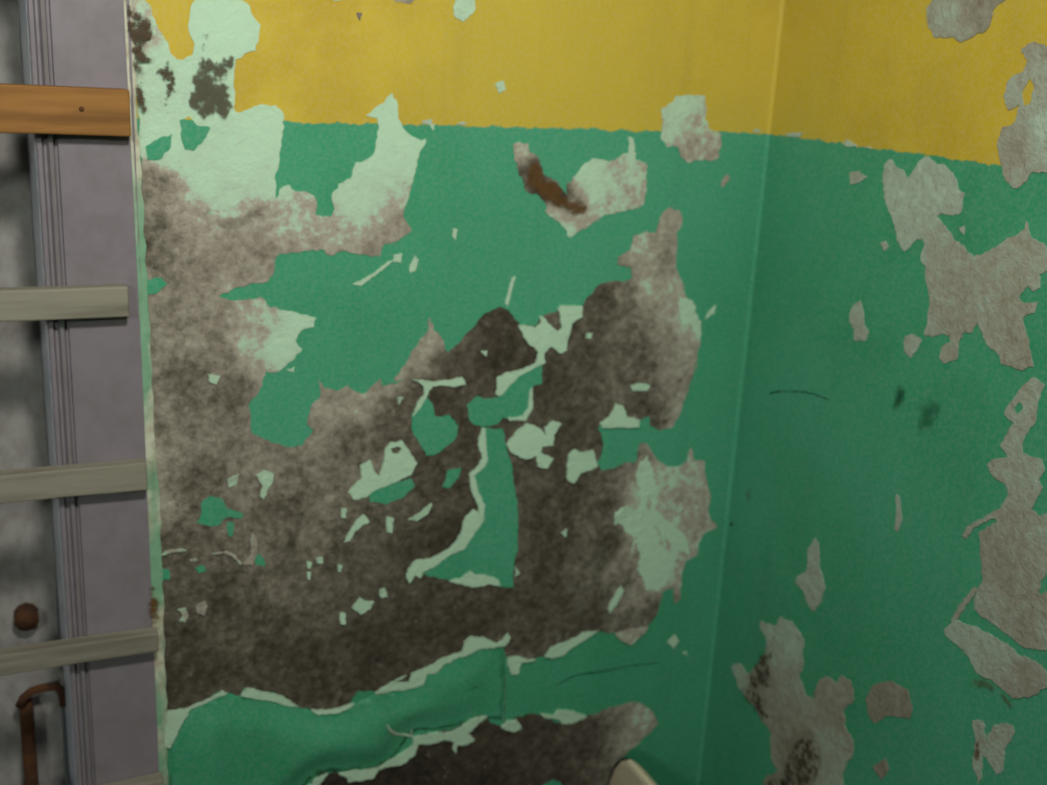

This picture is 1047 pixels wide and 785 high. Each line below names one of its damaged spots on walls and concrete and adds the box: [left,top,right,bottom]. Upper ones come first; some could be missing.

peeling [926,0,1005,42]
peeling [997,42,1047,188]
peeling [849,171,867,185]
peeling [849,301,869,341]
peeling [127,0,722,749]
peeling [880,156,1047,699]
peeling [795,538,826,611]
peeling [731,617,913,785]
peeling [309,702,658,785]